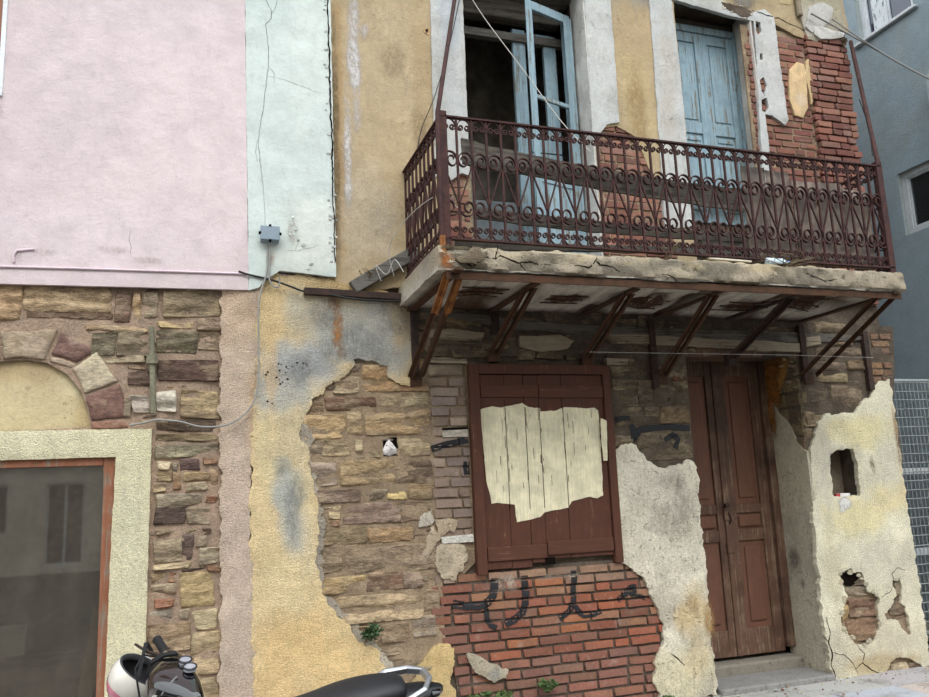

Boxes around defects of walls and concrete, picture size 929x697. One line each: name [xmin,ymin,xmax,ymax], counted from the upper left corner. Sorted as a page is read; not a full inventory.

crack [255,1,324,211]
spalling [721,1,865,223]
crack [451,244,550,270]
crack [575,258,620,272]
spalling [303,294,895,697]
crack [823,617,878,676]
spalling [838,570,910,647]